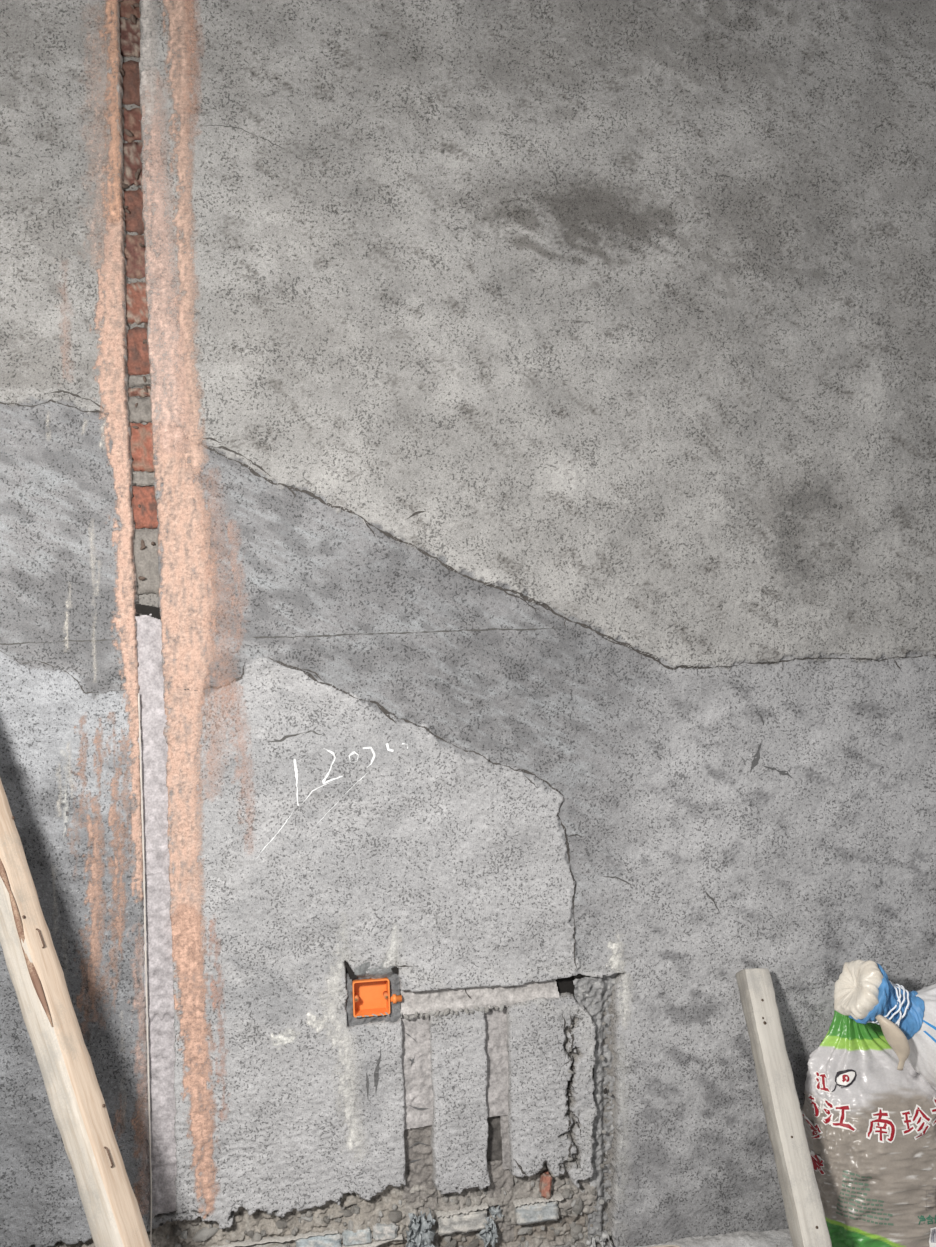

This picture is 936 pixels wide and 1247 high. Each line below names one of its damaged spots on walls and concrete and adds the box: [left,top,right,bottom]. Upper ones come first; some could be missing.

crack [0,390,129,416]
crack [0,639,124,694]
crack [157,422,936,971]
crack [558,1015,581,1168]